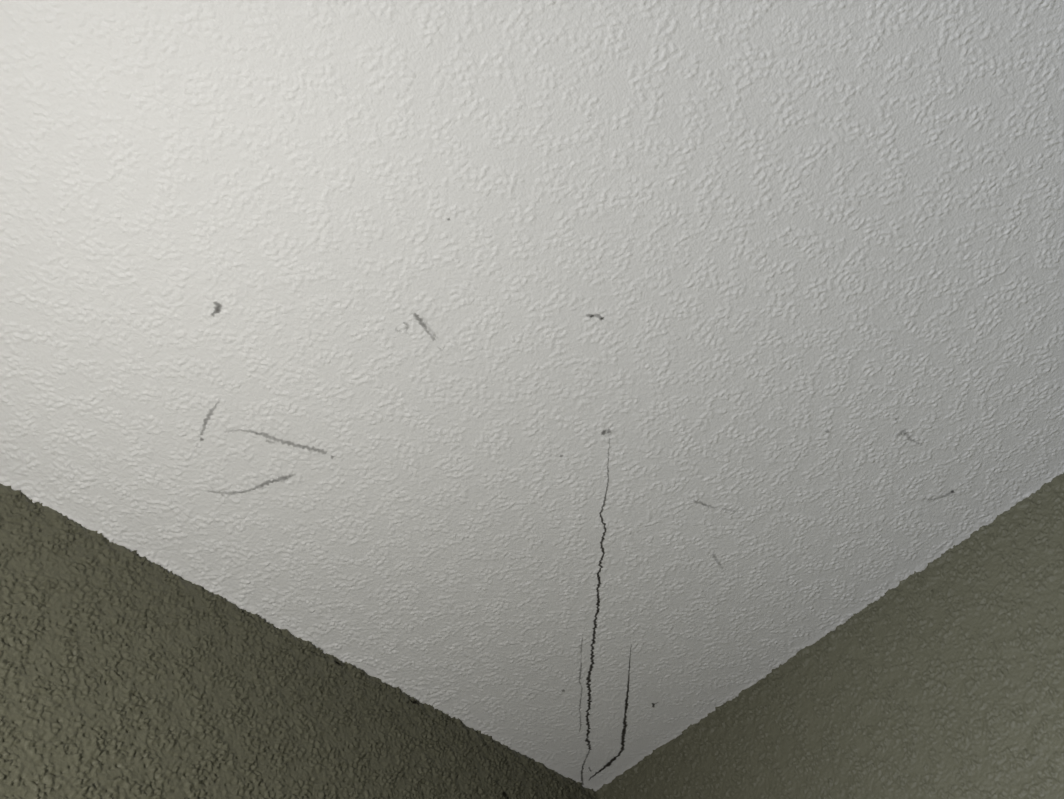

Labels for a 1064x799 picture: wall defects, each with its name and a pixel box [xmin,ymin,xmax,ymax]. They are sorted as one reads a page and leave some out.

crack [581,483,631,785]